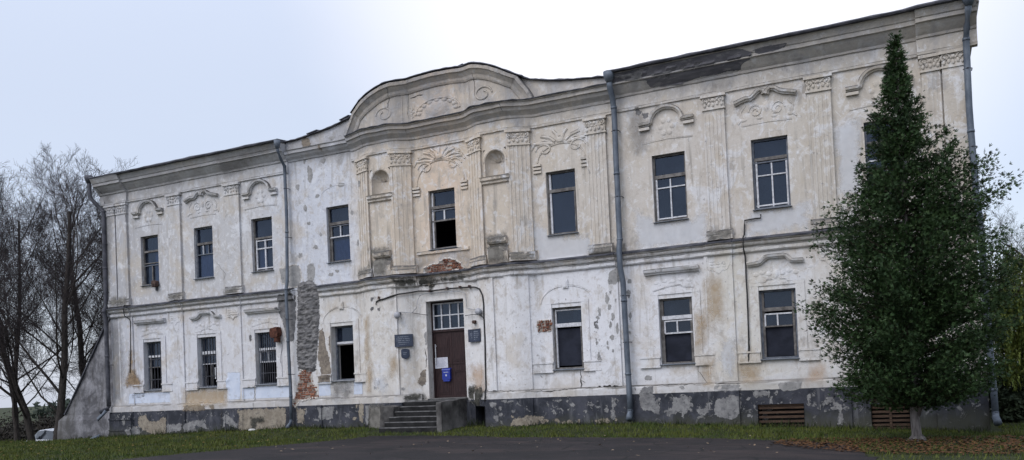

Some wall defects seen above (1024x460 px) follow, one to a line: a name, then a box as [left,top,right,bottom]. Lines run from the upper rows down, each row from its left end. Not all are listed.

spalling [274,136,335,341]
spalling [423,257,465,276]
spalling [536,319,553,333]
peeling [121,328,338,436]
peeling [490,397,617,426]
peeling [639,375,844,425]